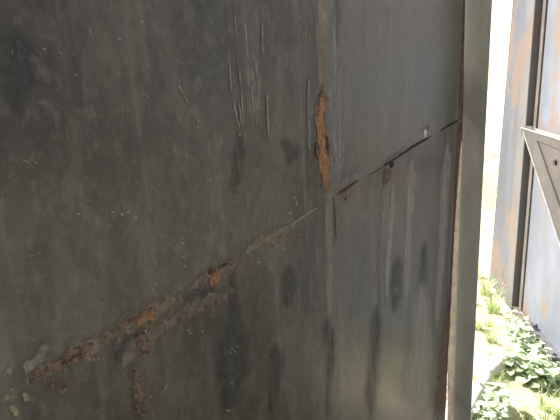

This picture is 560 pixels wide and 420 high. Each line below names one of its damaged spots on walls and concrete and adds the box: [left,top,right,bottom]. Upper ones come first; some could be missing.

rust [315,0,331,190]
crack [334,120,459,234]